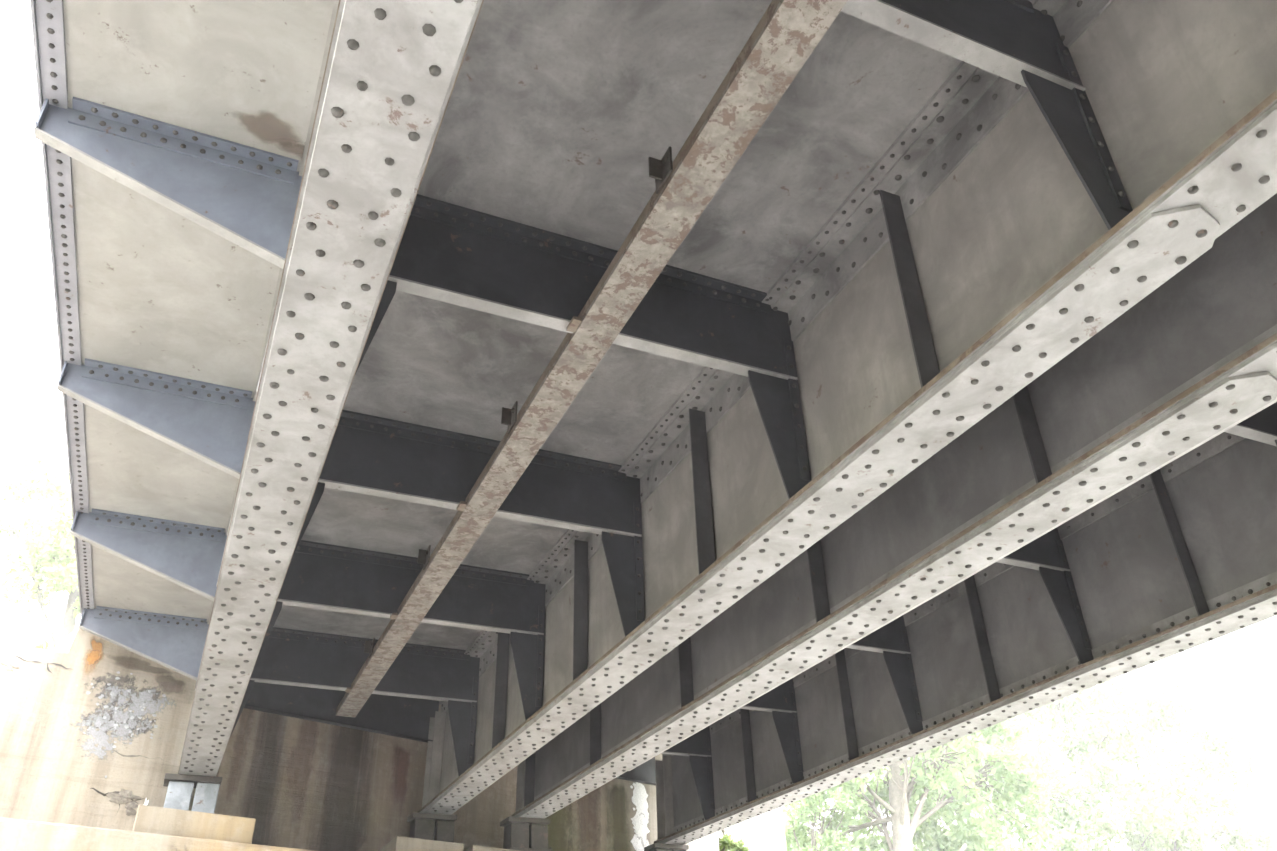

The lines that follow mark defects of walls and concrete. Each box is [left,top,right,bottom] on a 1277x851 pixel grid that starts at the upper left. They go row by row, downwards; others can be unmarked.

rust [85,639,103,669]
peeling [76,671,175,759]
spalling [105,776,149,816]
leakage [545,806,571,851]
leakage [609,786,629,851]